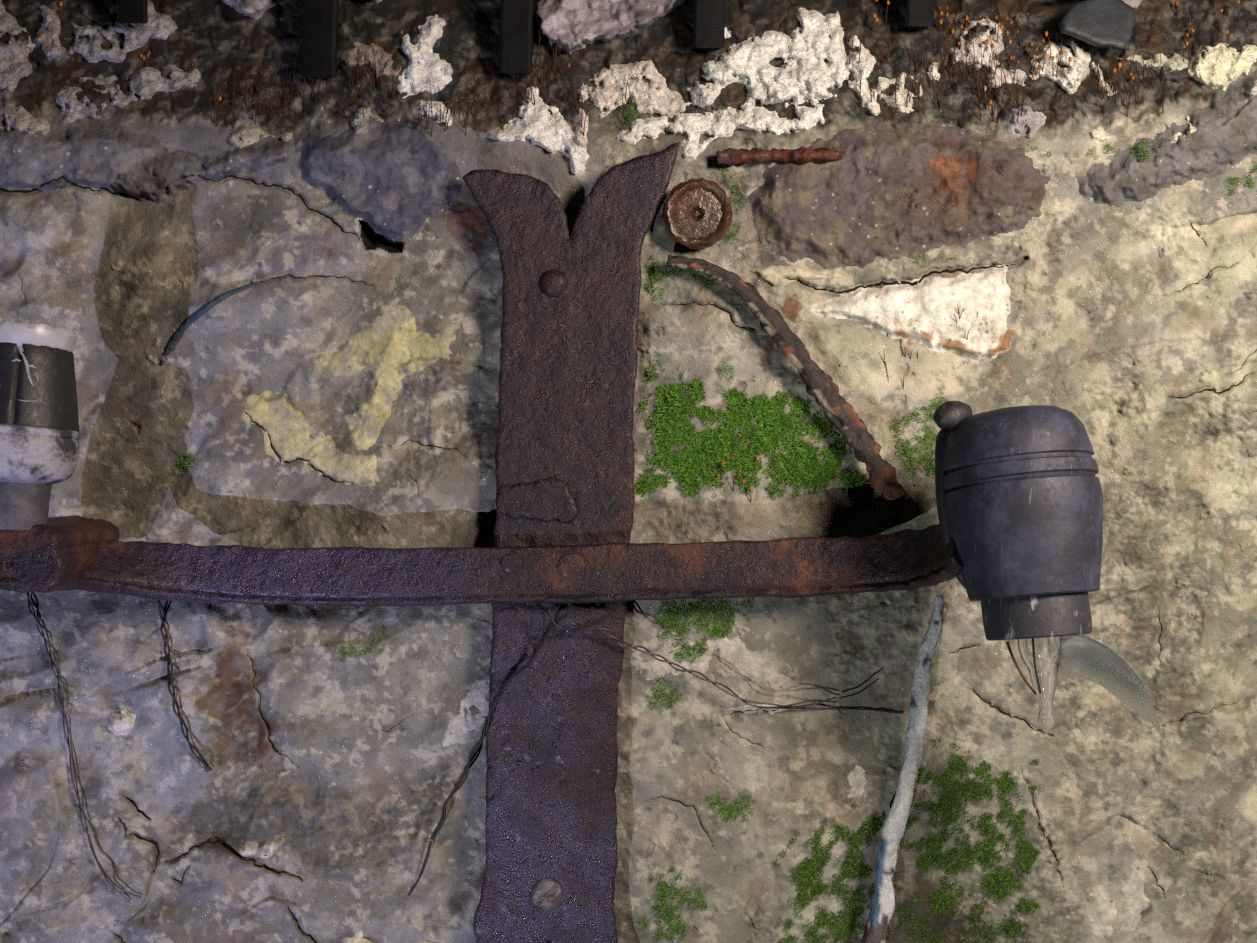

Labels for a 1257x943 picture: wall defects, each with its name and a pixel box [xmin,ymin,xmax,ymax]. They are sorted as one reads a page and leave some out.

crack [0,176,138,200]
crack [166,175,403,247]
crack [253,274,378,293]
crack [1167,220,1239,295]
rust [666,255,908,509]
crack [1168,350,1257,412]
crack [247,649,296,765]
crack [118,797,316,943]